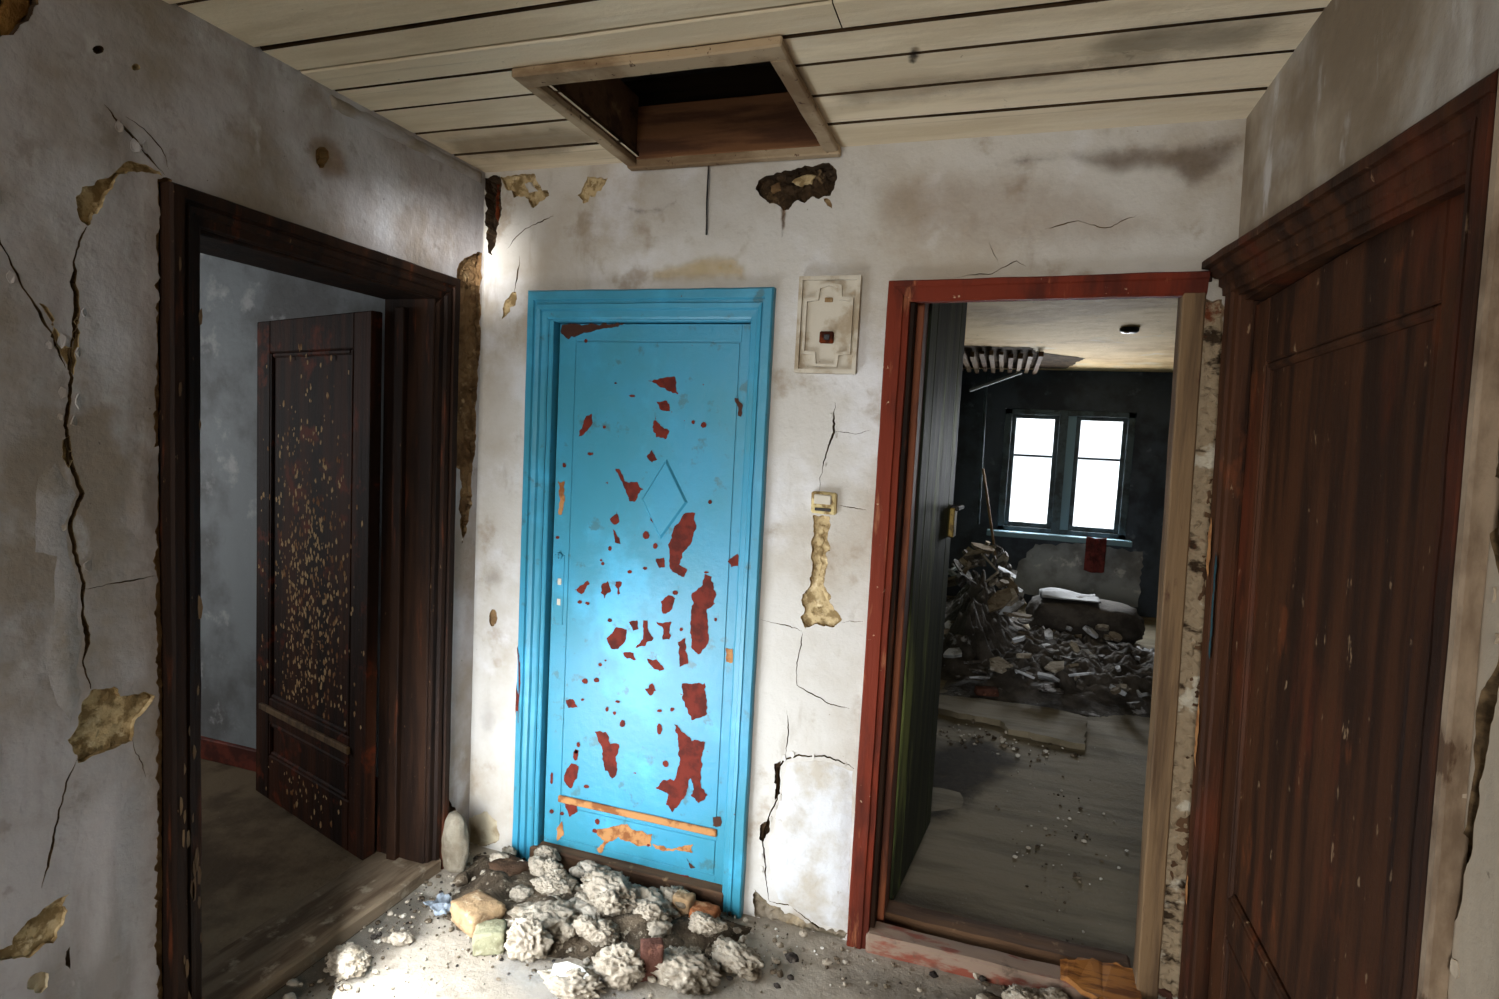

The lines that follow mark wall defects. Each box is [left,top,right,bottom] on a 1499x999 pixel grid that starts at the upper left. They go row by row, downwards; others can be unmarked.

flaking render [0,0,38,36]
flaking render [578,177,607,204]
flaking render [756,163,837,210]
crack [0,227,151,689]
flaking render [68,161,202,999]
flaking render [801,515,842,628]
crack [759,620,854,929]
flaking render [0,894,71,993]